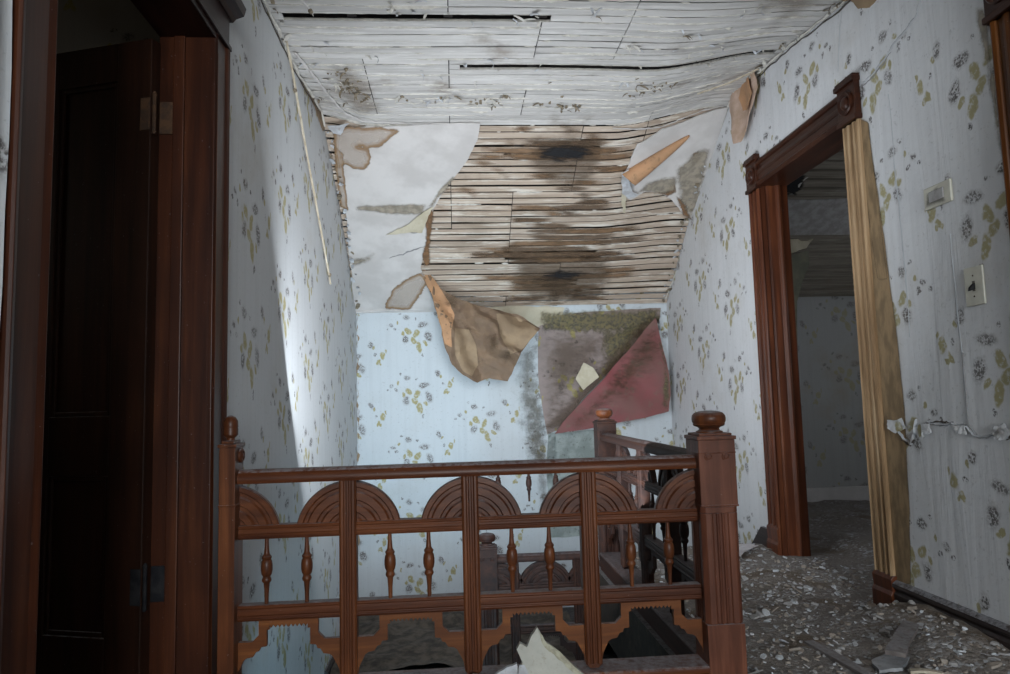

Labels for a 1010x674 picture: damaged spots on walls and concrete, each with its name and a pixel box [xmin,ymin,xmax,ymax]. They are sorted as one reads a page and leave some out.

peeling [302,68,371,131]
peeling [395,94,511,111]
peeling [532,96,581,113]
peeling [611,78,678,98]
leakage [641,151,707,219]
leakage [473,130,658,363]
leakage [525,354,544,459]